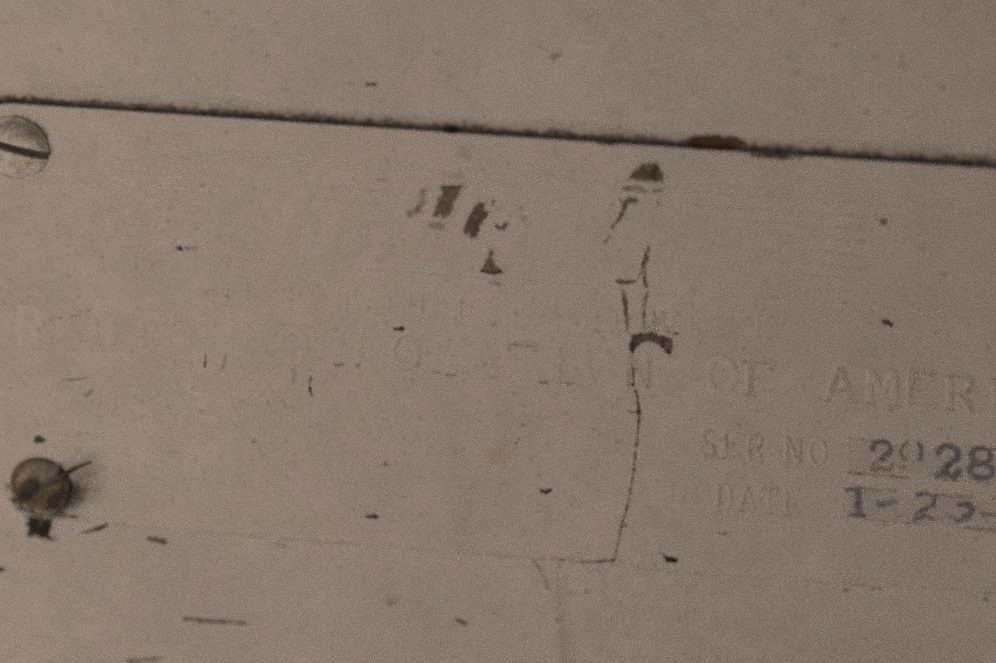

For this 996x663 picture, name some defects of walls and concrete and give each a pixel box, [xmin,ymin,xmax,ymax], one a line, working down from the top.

peeling [430,182,507,278]
peeling [611,159,668,228]
crack [538,291,649,564]